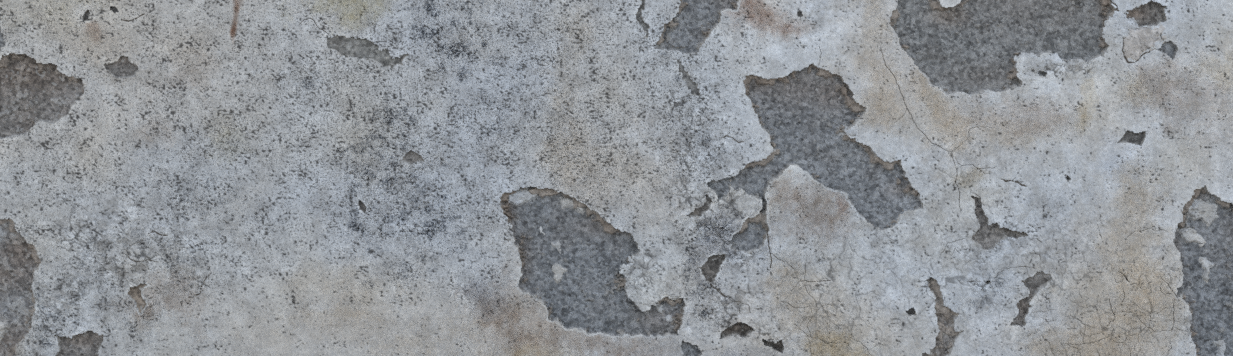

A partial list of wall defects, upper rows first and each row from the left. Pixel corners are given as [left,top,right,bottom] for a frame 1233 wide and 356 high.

flaking render [0,26,85,139]
peeling [327,35,409,69]
flaking render [635,0,739,96]
flaking render [889,0,1166,95]
flaking render [686,63,923,284]
flaking render [0,218,42,356]
flaking render [54,331,103,356]
flaking render [500,186,702,356]
flaking render [922,277,963,356]
flaking render [971,196,1029,250]
flaking render [1010,271,1052,327]
flaking render [1173,185,1233,356]